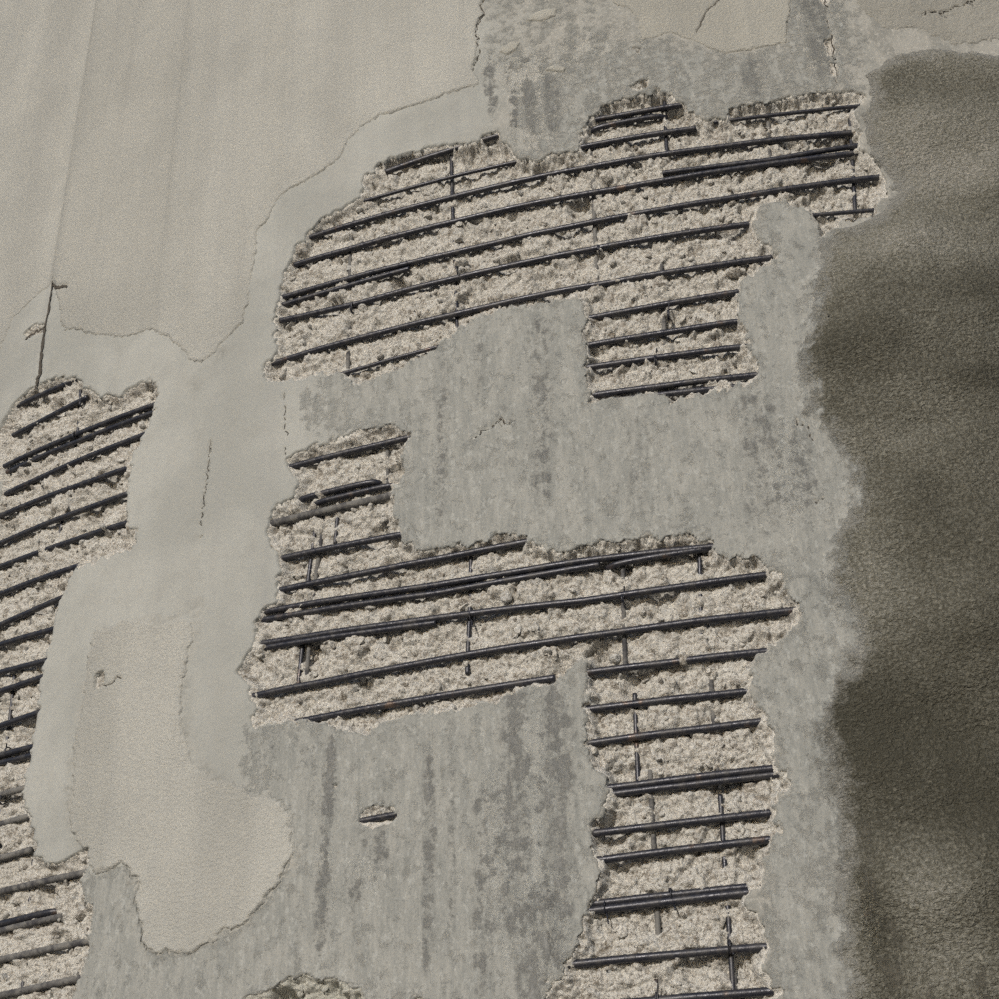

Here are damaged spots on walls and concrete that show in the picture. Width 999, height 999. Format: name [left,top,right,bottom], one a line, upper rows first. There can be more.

crack [26,281,67,390]
peeling [0,0,576,363]
spalling [0,377,802,999]
crack [473,0,485,70]
spalling [262,0,888,999]
leakage [797,49,999,999]
peeling [853,0,999,46]